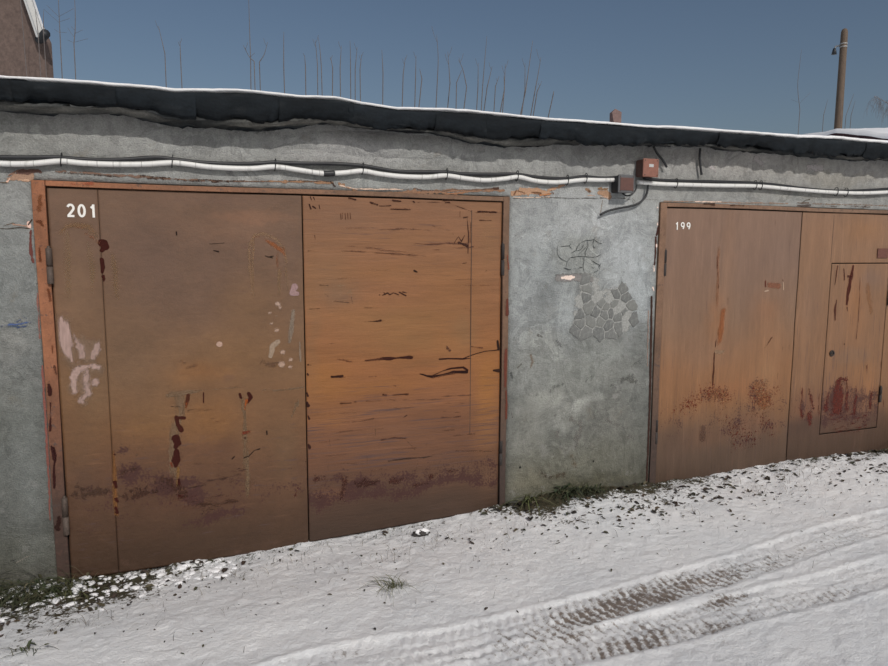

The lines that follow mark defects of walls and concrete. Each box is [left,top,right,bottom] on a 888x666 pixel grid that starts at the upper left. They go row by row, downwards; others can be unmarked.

corrosion [113,394,245,515]
corrosion [673,309,778,450]
corrosion [800,377,873,433]